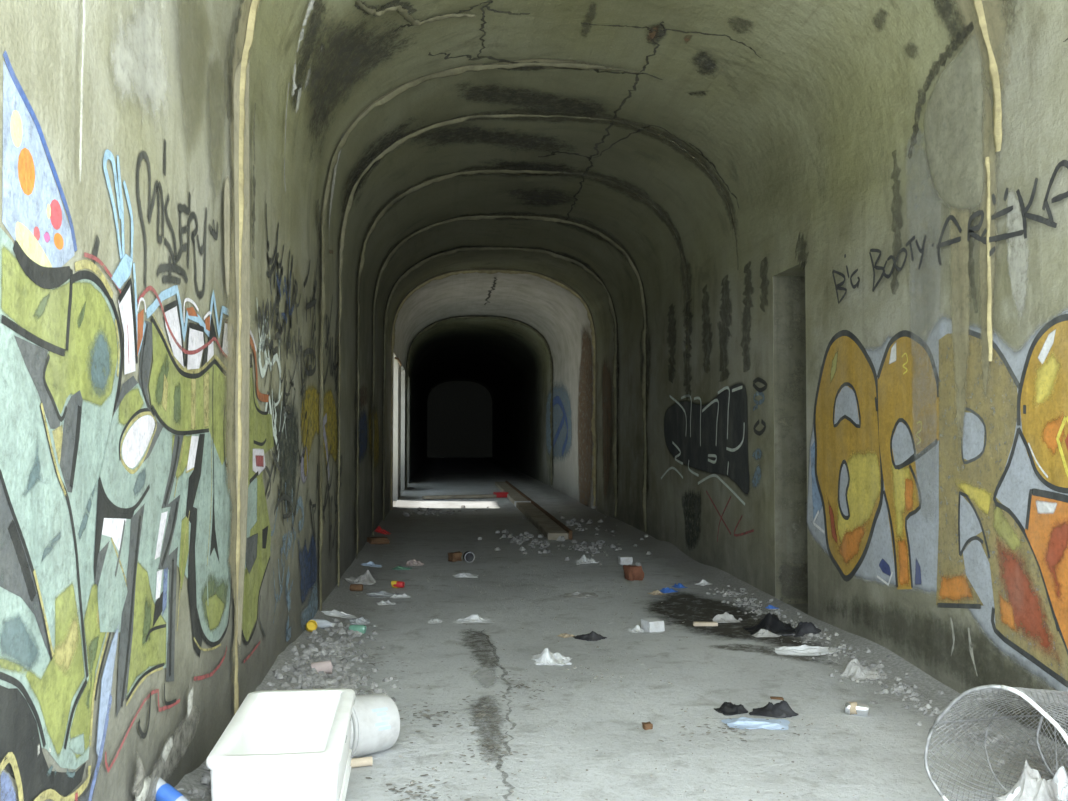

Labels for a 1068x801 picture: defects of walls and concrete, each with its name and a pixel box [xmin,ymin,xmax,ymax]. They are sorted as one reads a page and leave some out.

water stain [310,0,475,138]
crack [393,0,761,220]
water stain [891,151,902,293]
water stain [934,0,1028,454]
water stain [224,0,260,715]